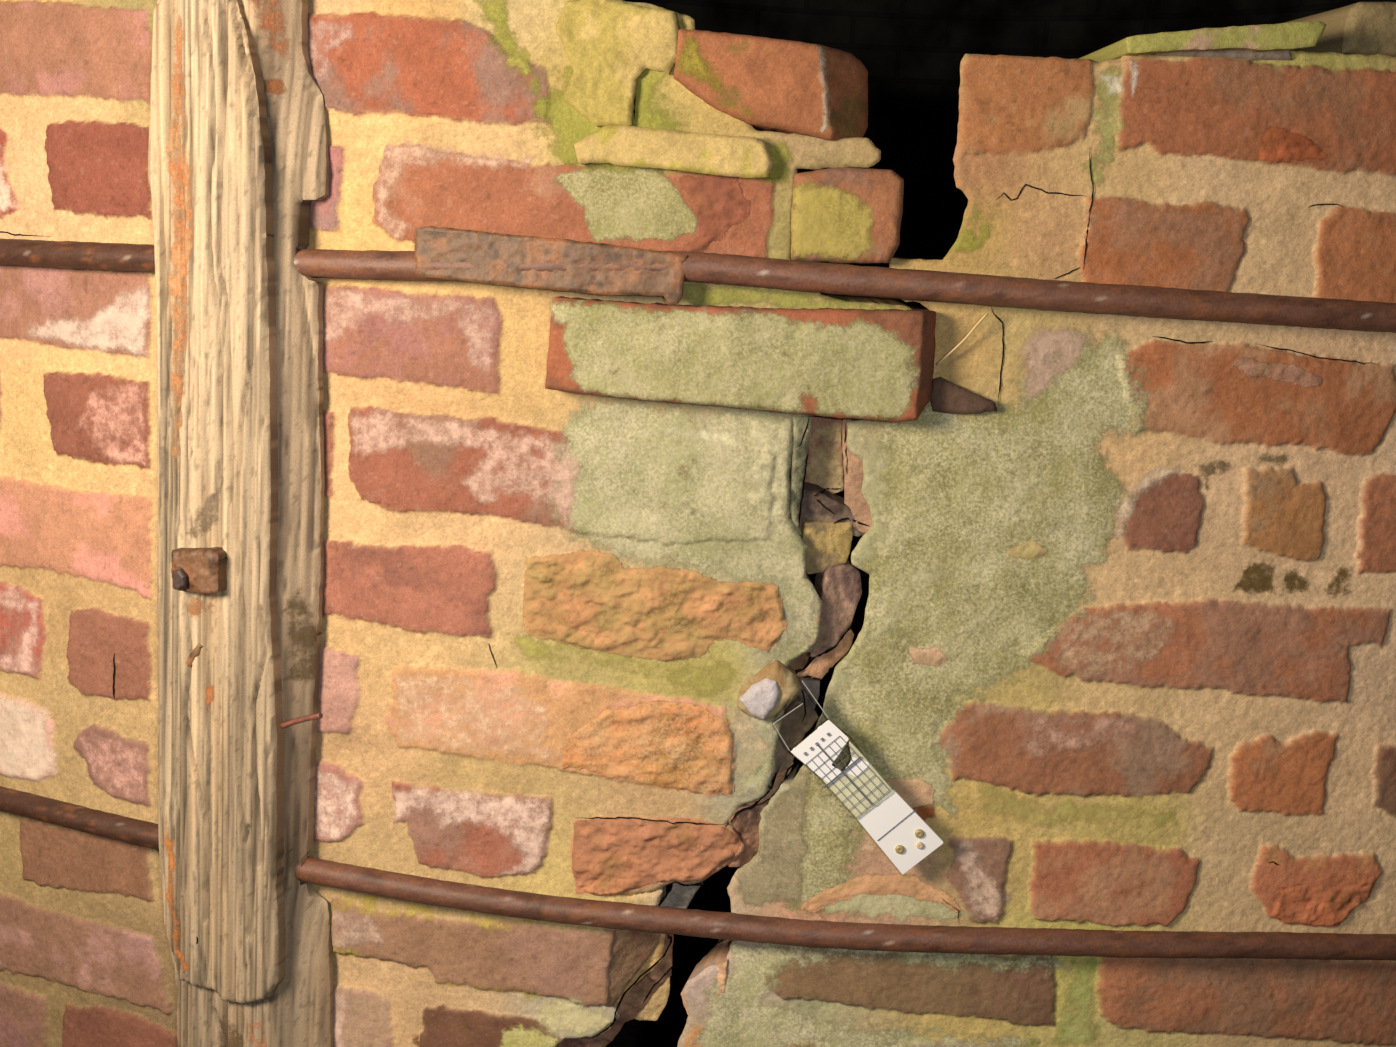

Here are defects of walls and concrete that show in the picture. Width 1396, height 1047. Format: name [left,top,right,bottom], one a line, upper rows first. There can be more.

spalling [1258,126,1327,163]
spalling [677,175,750,252]
spalling [791,167,904,264]
crack [995,148,1094,279]
water stain [1023,329,1085,401]
water stain [662,416,793,523]
water stain [1060,611,1172,677]
crack [558,416,872,1047]
water stain [1022,716,1140,756]